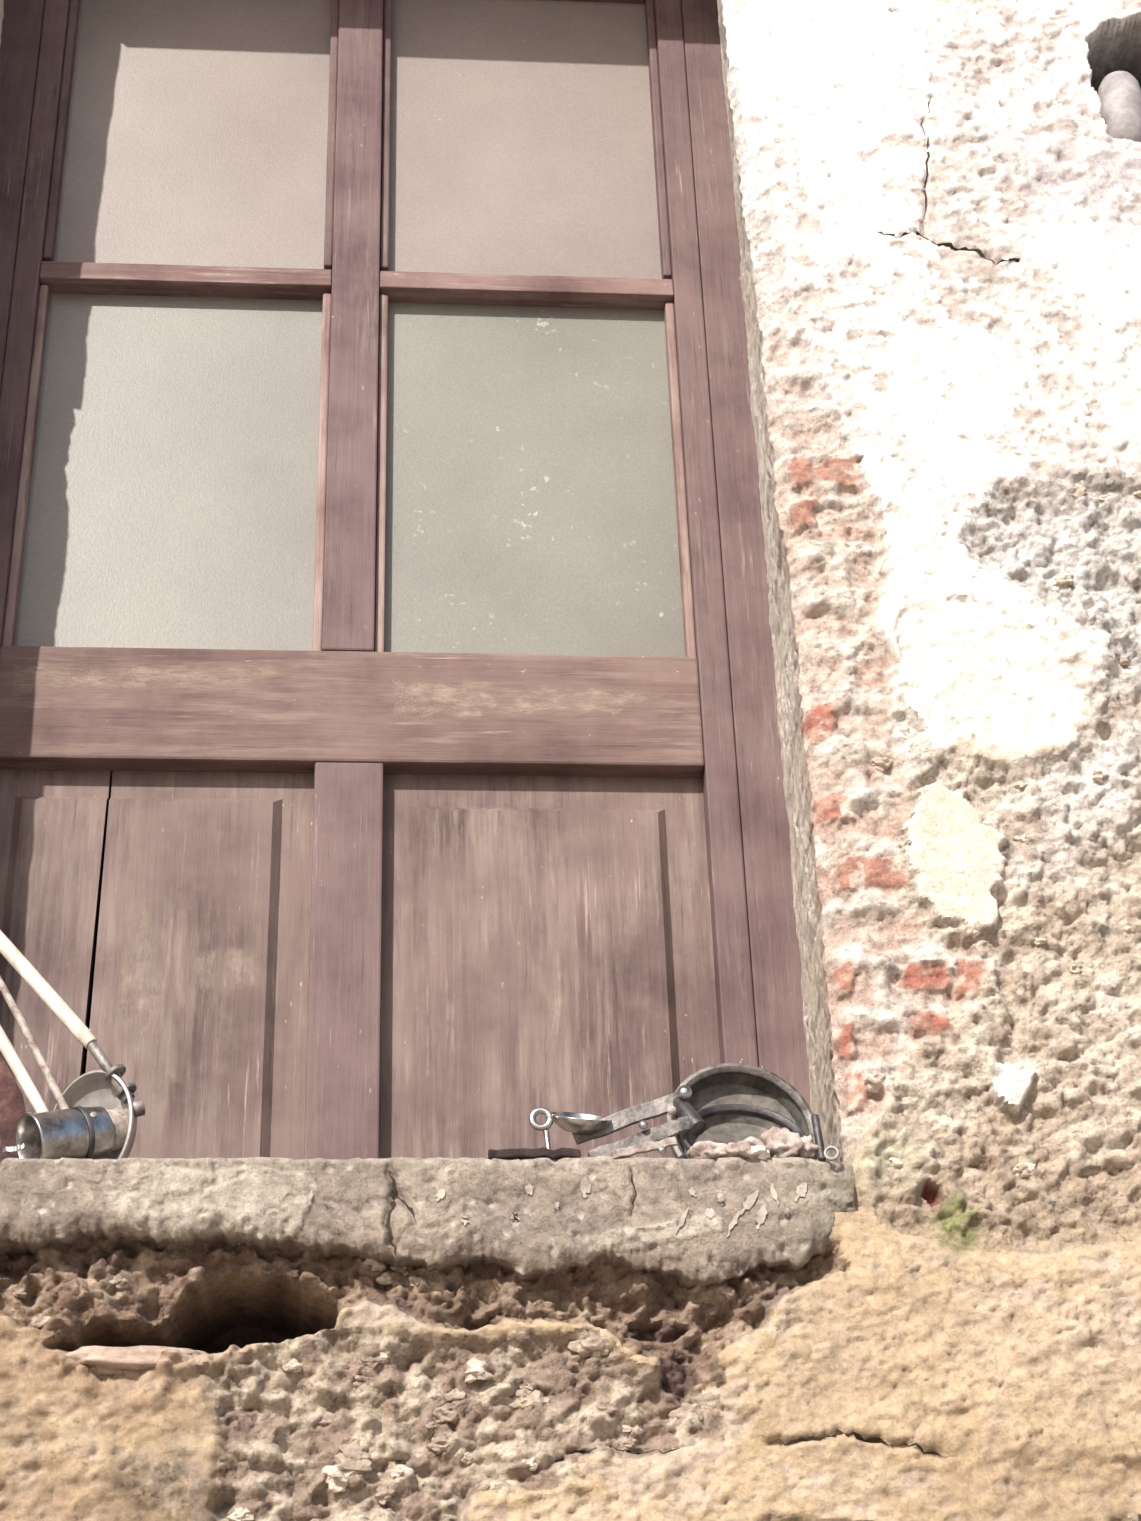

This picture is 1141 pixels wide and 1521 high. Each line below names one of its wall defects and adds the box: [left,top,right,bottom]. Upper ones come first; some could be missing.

crack [878,91,1020,265]
spalling [726,46,1141,1255]
crack [385,1169,416,1259]
spalling [0,1166,851,1521]
crack [770,1429,949,1458]